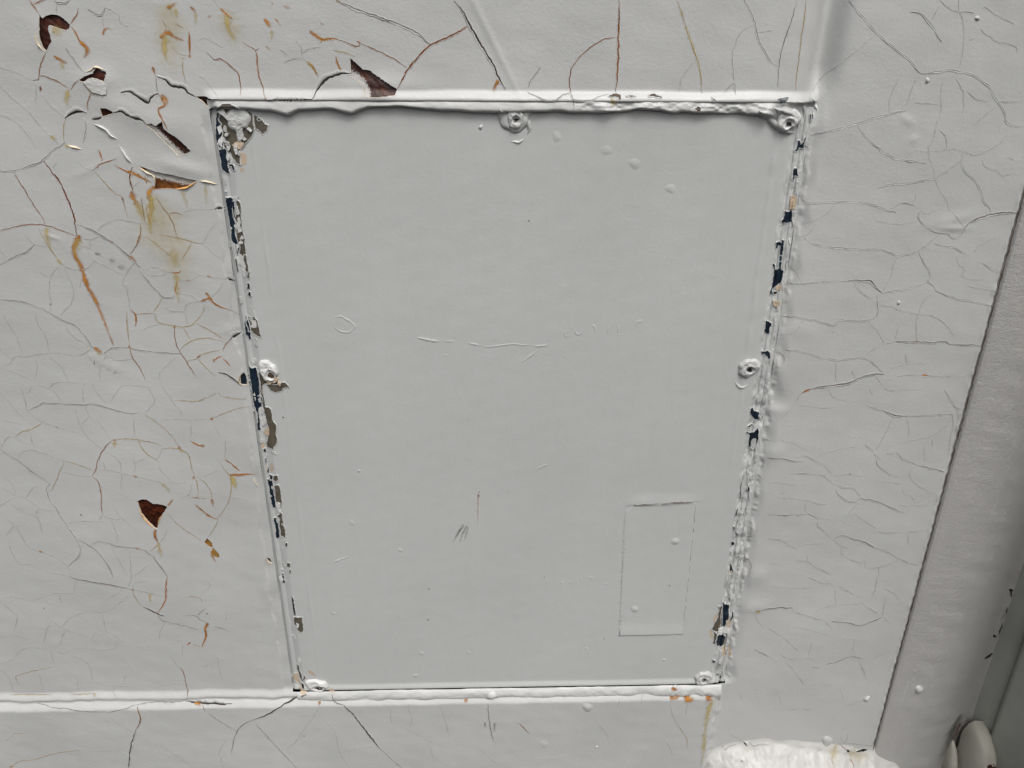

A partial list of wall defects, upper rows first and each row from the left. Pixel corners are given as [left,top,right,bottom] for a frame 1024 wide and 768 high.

crack [55,0,128,28]
peeling [267,57,398,108]
crack [172,0,621,107]
peeling [780,113,815,226]
peeling [1,0,304,633]
peeling [763,238,791,335]
crack [676,0,1024,685]
crack [0,87,402,768]
peeling [745,407,760,450]
peeling [729,473,753,576]
peeling [709,600,735,680]
crack [478,705,531,764]